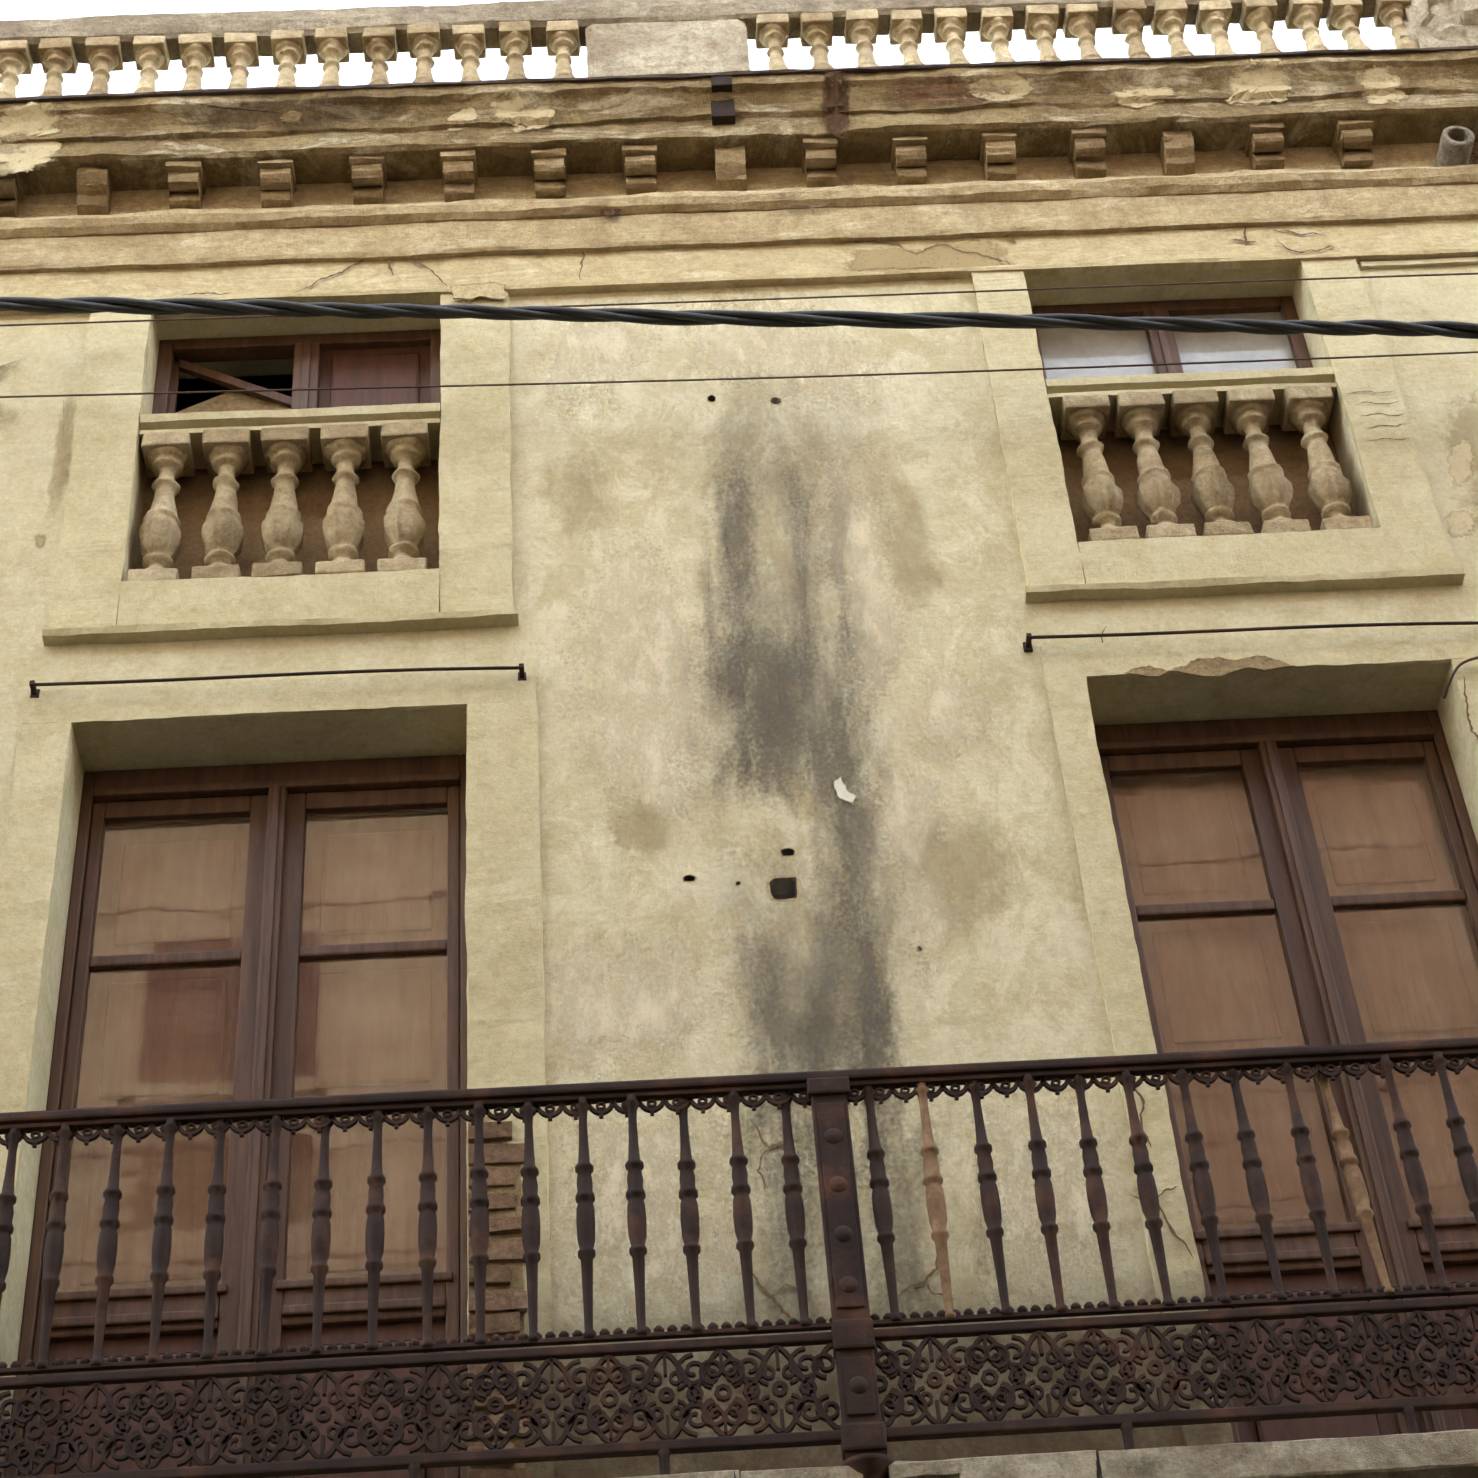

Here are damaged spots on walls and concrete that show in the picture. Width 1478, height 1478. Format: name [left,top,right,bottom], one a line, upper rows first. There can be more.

peeling [967,71,1035,104]
peeling [1225,58,1294,106]
peeling [1355,61,1410,104]
peeling [0,102,62,176]
crack [183,289,232,297]
crack [294,258,447,293]
damp [551,322,660,406]
damp [687,297,875,406]
spalling [1125,655,1296,677]
crack [1463,678,1478,739]
damp [575,1119,732,1329]
damp [985,1103,1128,1294]